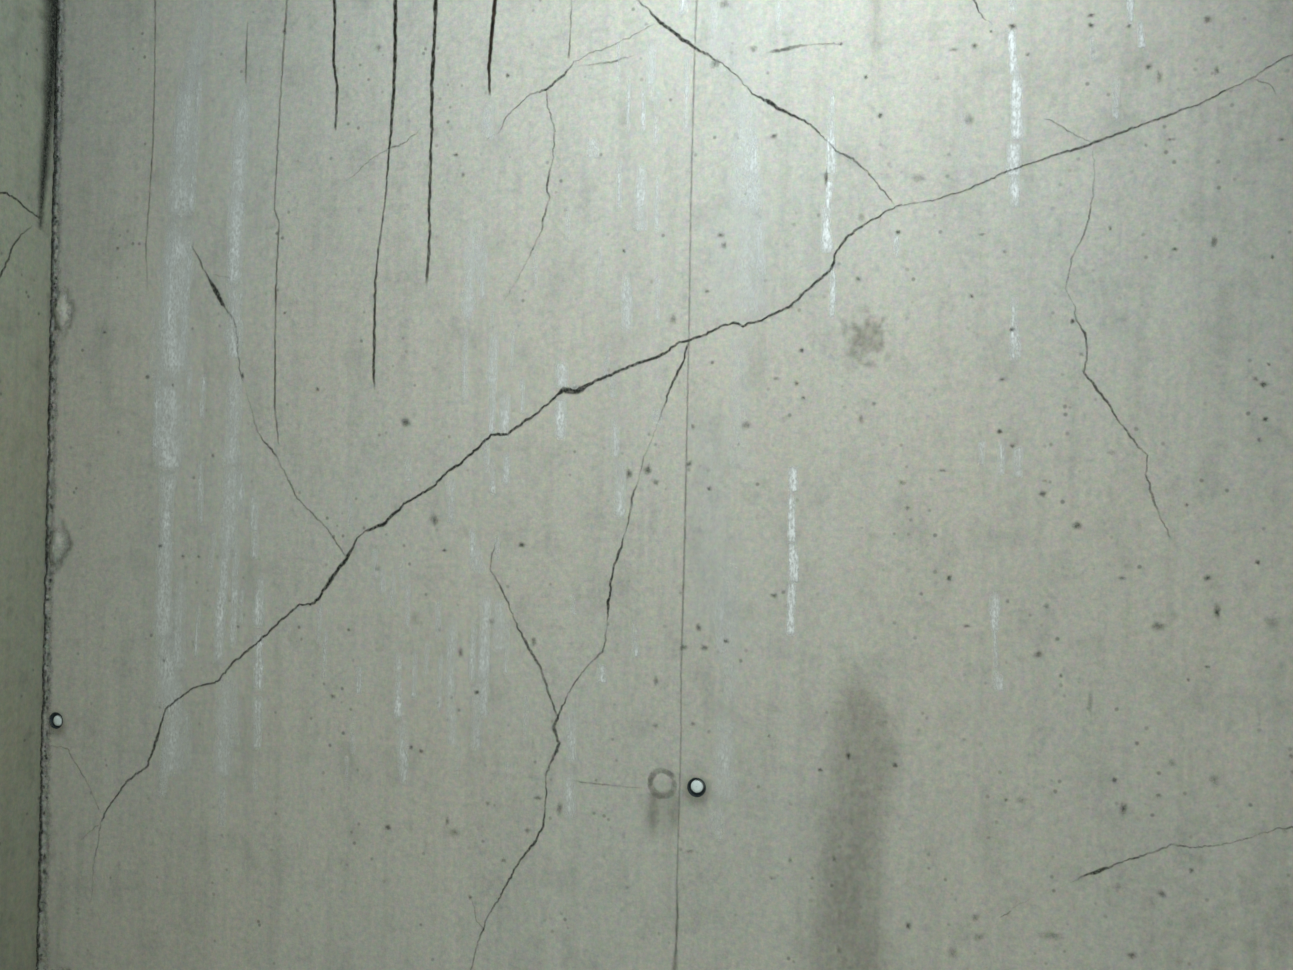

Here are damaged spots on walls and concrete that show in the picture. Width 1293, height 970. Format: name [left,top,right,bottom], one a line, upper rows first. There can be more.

crack [650,10,730,70]
crack [930,90,1226,201]
crack [103,92,899,819]
crack [1087,377,1133,439]
crack [482,586,578,932]
crack [1085,857,1139,876]